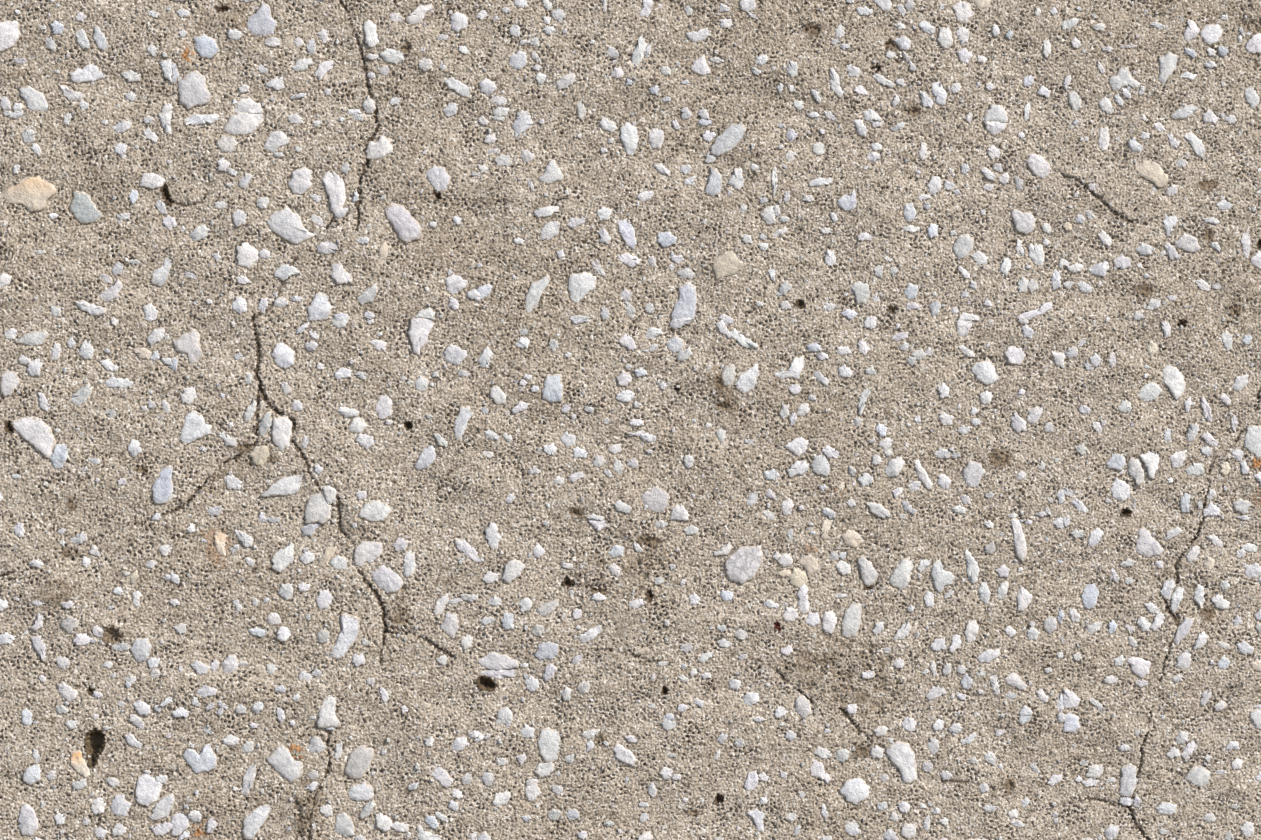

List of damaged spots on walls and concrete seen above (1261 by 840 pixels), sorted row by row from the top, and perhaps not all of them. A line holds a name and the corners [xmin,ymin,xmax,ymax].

crack [326,0,379,233]
crack [2,256,454,663]
crack [1084,387,1261,840]